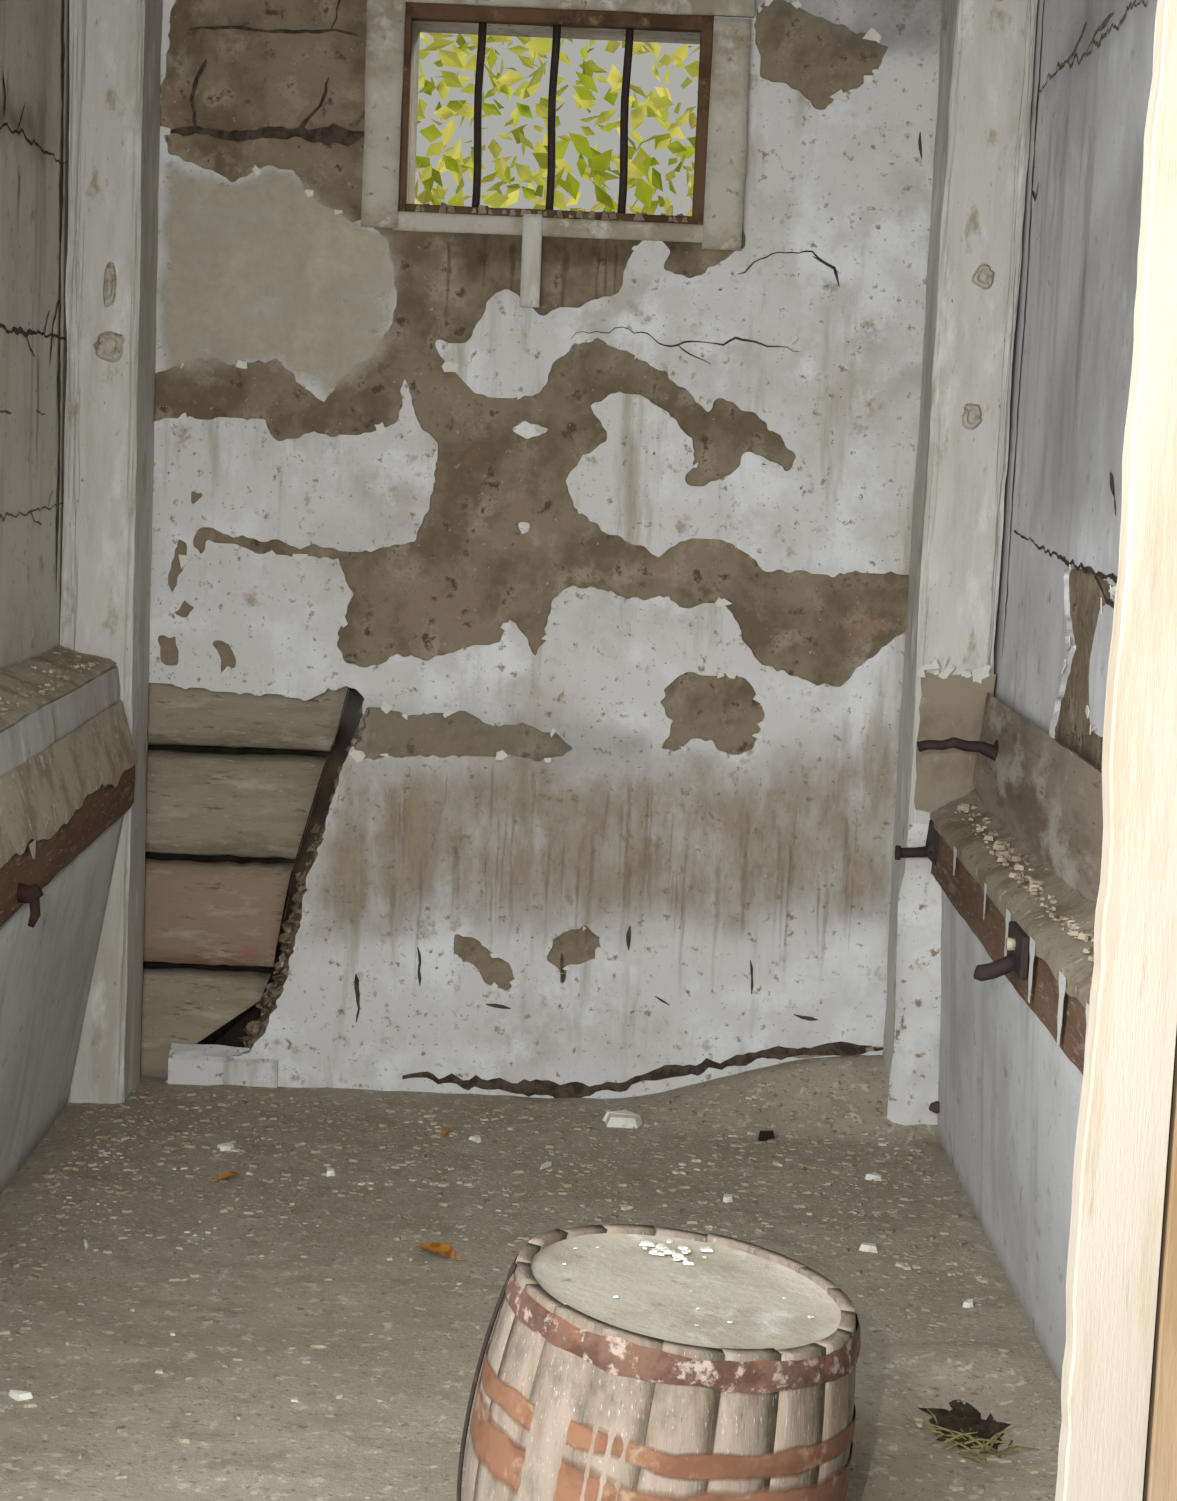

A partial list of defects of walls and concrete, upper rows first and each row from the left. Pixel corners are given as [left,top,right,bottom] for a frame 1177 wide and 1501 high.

crack [0,0,67,587]
flaking render [154,0,909,686]
crack [1002,0,1148,654]
flaking render [661,672,768,755]
spalling [1055,564,1116,771]
spalling [143,687,572,1050]
leakage [326,777,704,913]
spalling [547,925,608,983]
leakage [683,772,882,911]
crack [402,1041,883,1098]